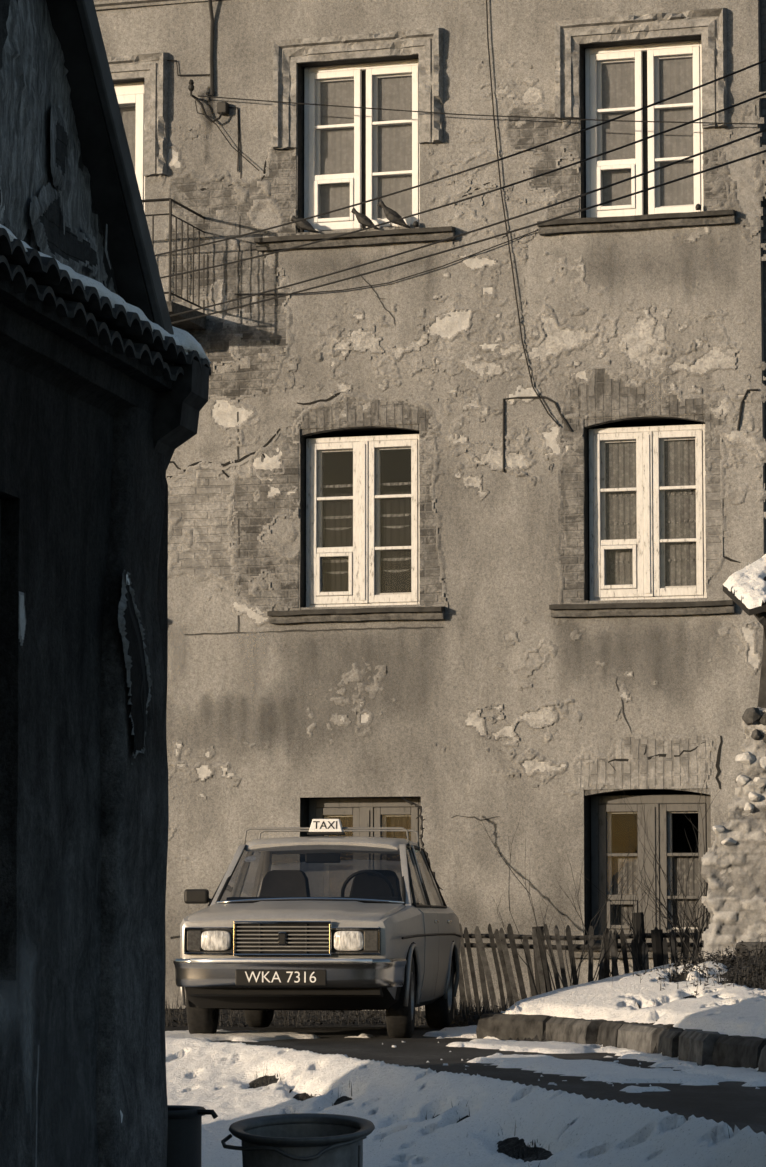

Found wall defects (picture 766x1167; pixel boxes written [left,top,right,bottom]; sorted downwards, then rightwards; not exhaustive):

peeling [0,0,116,294]
crack [297,388,353,405]
flaking render [148,57,766,645]
crack [166,428,280,482]
flaking render [118,570,152,765]
peeling [306,645,397,745]
peeling [707,621,763,676]
peeling [168,740,244,800]
flaking render [464,698,715,798]